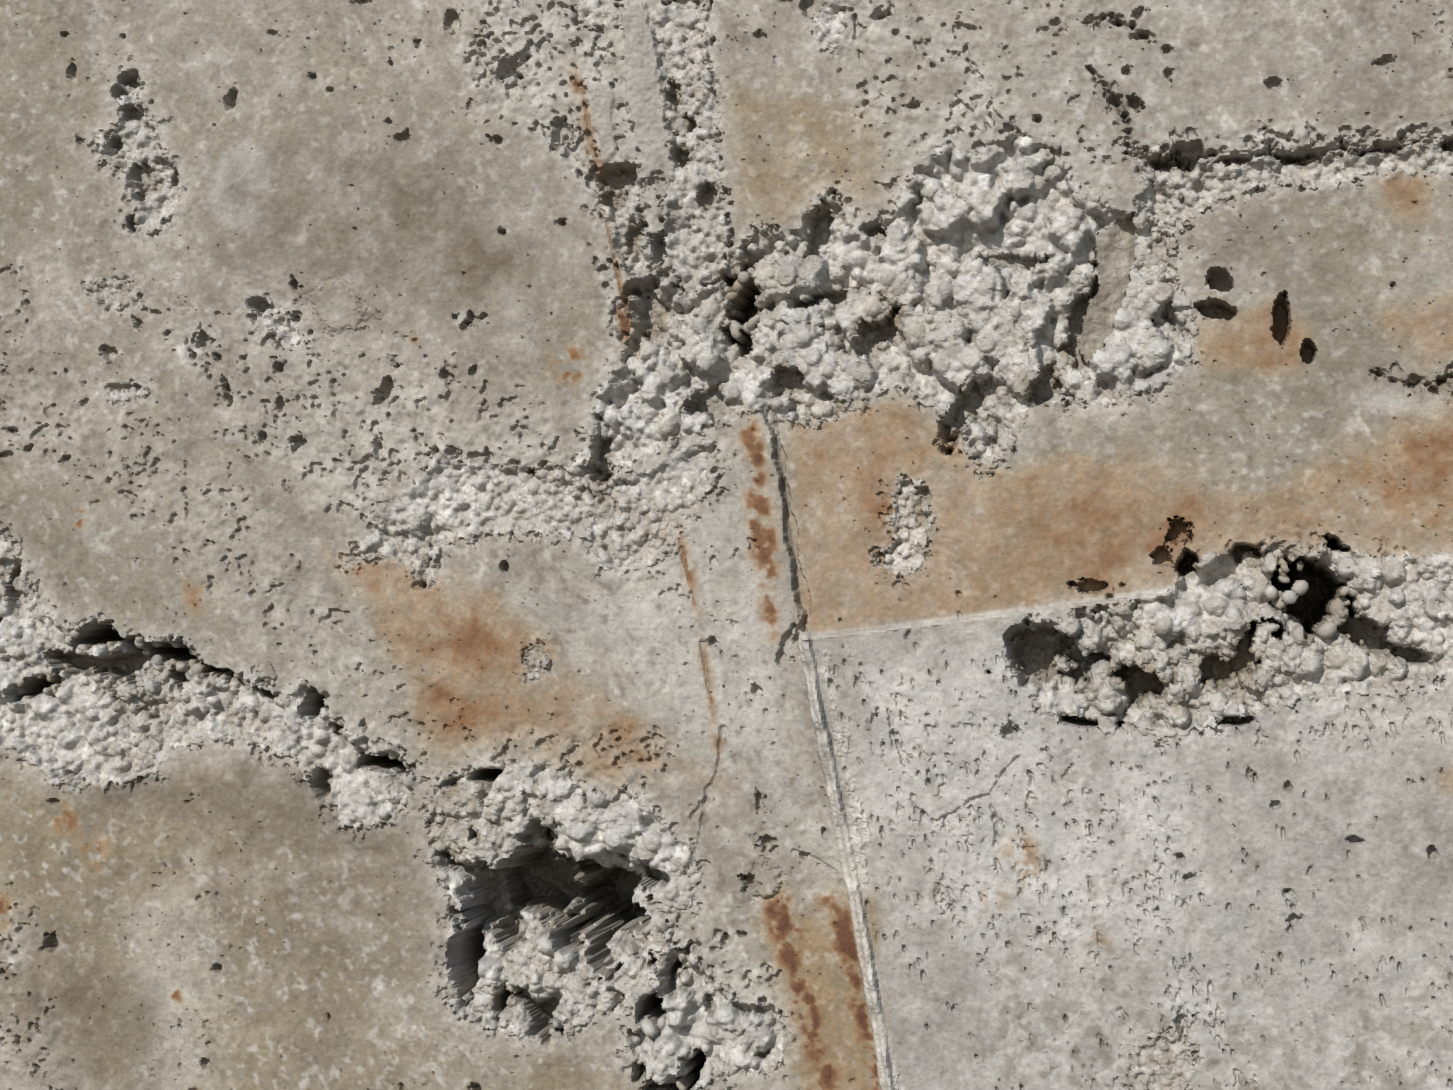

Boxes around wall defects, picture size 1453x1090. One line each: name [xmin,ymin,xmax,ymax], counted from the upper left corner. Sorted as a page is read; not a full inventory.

crack [1081,10,1453,175]
rust [1194,294,1320,381]
rust [1369,285,1453,376]
crack [761,412,815,669]
rust [734,390,1453,647]
crack [790,847,850,896]
rust [754,885,889,1090]